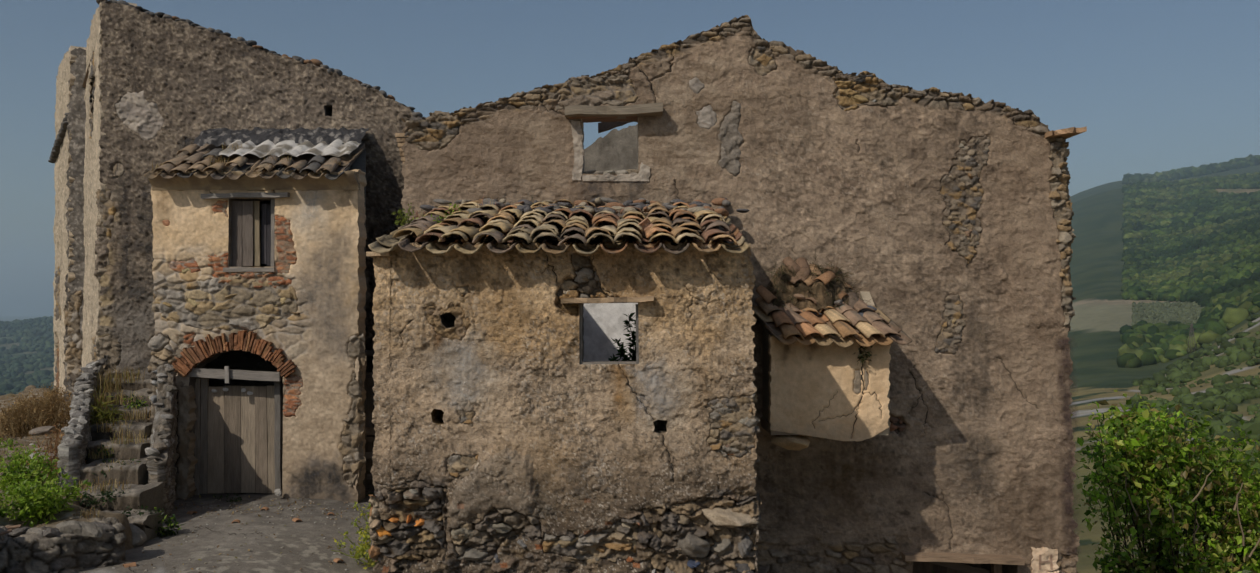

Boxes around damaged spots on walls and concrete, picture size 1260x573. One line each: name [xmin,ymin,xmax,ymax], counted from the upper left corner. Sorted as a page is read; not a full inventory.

spalling [212,200,230,221]
spalling [147,215,303,423]
spalling [557,254,610,315]
crack [618,364,677,479]
crack [812,346,931,438]